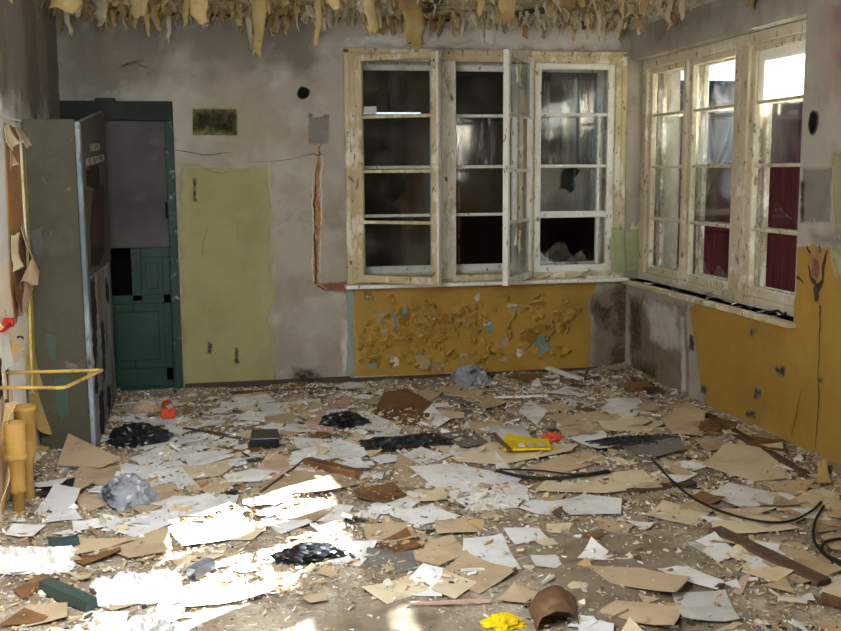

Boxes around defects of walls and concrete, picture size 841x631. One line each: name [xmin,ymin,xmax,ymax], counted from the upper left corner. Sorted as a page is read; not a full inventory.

peeling [0,324,52,524]
peeling [342,290,582,377]
water stain [589,283,694,395]
crack [791,245,836,448]